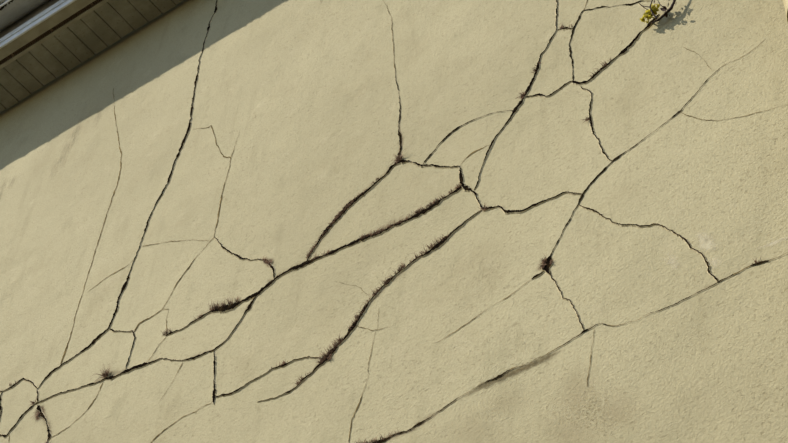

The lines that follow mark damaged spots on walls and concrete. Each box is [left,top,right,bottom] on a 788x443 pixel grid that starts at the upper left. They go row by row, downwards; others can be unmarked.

crack [0,0,481,443]
crack [160,0,783,339]
crack [348,271,632,443]